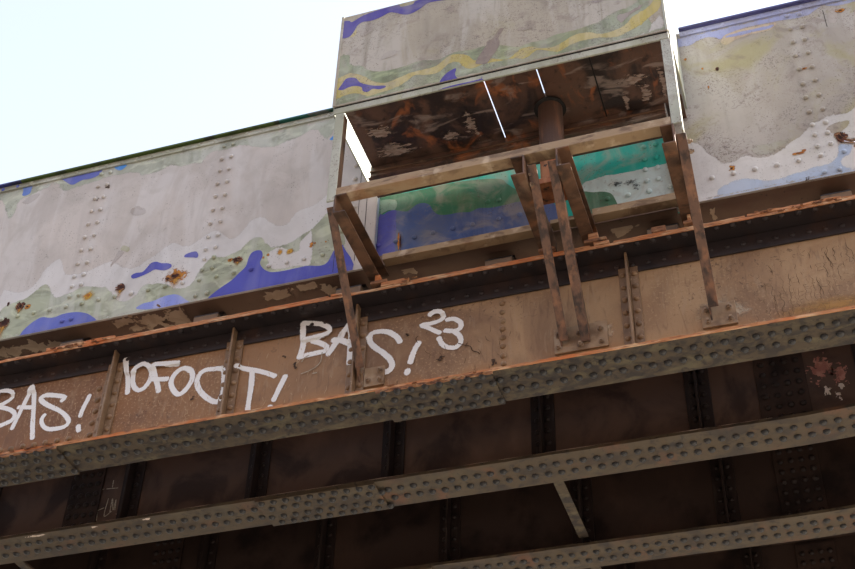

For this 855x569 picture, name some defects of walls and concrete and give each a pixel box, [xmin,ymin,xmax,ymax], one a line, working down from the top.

corrosion [163,269,189,285]
peeling [263,282,338,301]
crack [726,242,855,319]
peeling [805,354,848,400]